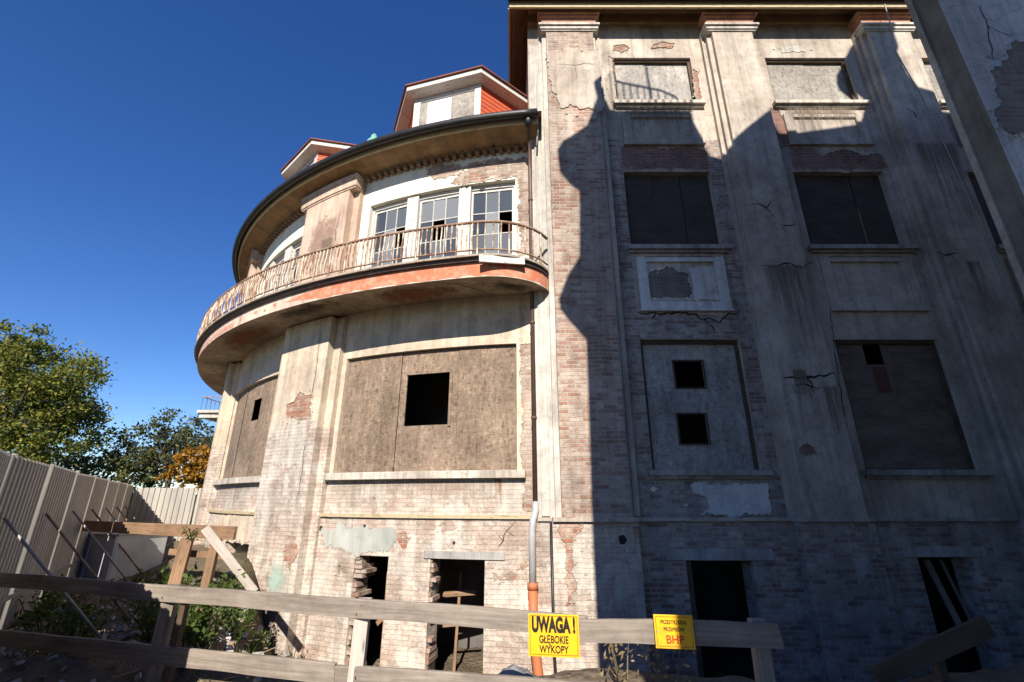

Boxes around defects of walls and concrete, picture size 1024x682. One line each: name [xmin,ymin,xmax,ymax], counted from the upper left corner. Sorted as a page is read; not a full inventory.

flaking render [650,41,674,49]
crack [980,4,1013,61]
flaking render [545,44,630,120]
flaking render [983,38,1024,139]
peeling [254,156,549,314]
crack [757,201,795,231]
flaking render [648,264,719,301]
crack [637,310,740,334]
crack [783,312,847,427]
flaking render [285,389,314,424]
flaking render [674,482,772,517]
flaking render [557,522,587,606]